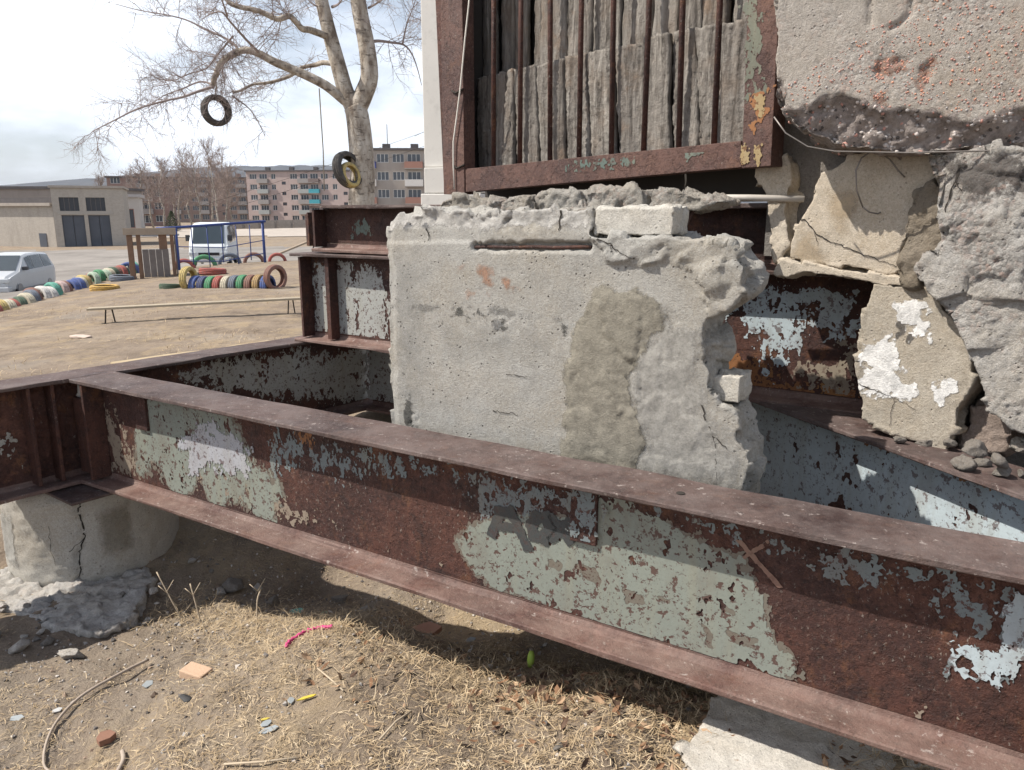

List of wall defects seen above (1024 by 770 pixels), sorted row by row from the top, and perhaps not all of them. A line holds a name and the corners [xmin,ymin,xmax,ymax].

rust [740,84,776,167]
spalling [388,203,590,232]
crack [801,219,897,267]
peeling [167,260,394,406]
rust [729,353,860,398]
peeling [725,285,958,407]
peeling [0,432,23,469]
crack [48,504,86,576]
peeling [104,399,1024,692]